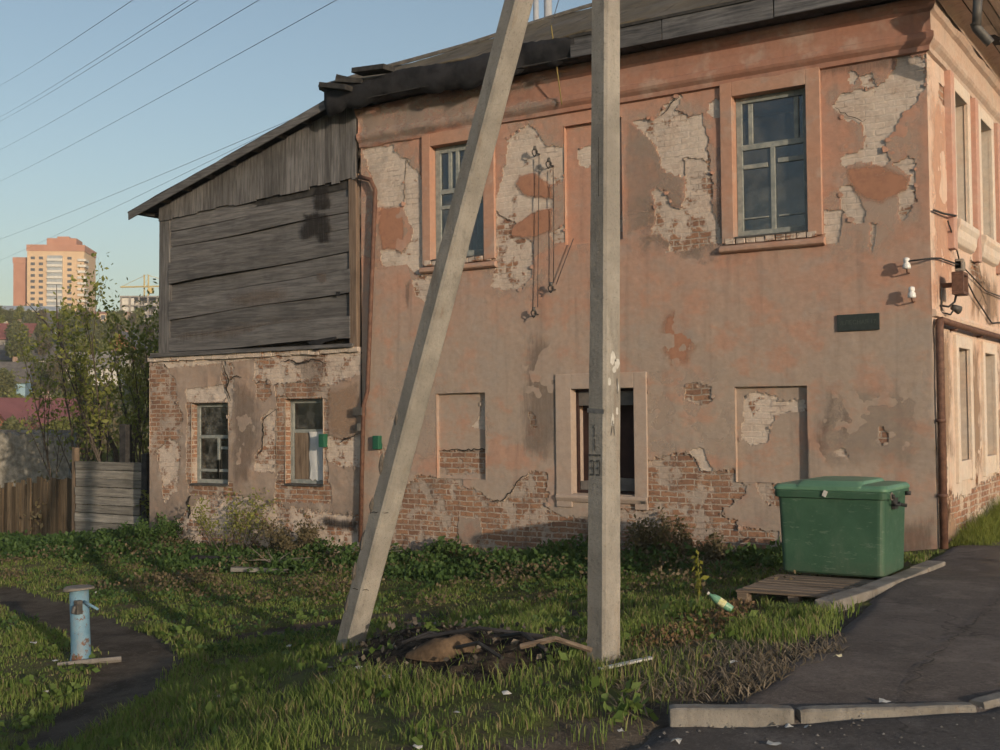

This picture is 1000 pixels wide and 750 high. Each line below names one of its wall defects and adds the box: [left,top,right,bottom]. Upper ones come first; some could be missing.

flaking render [361,90,480,302]
flaking render [491,124,566,292]
flaking render [577,145,591,168]
flaking render [633,94,722,253]
flaking render [824,185,878,251]
flaking render [832,54,944,221]
crack [221,361,241,401]
flaking render [148,347,373,581]
flaking render [390,449,588,555]
flaking render [684,382,715,406]
flaking render [620,447,781,552]
flaking render [738,391,807,446]